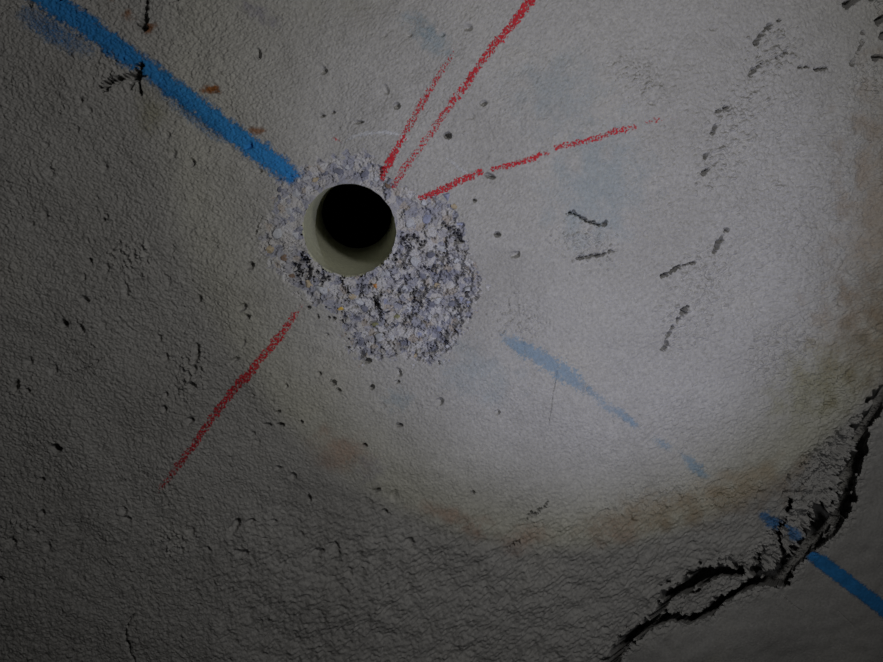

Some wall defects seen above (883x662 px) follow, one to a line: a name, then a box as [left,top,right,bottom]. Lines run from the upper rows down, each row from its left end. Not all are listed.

crack [98,62,147,97]
spalling [257,148,491,368]
crack [600,385,883,662]